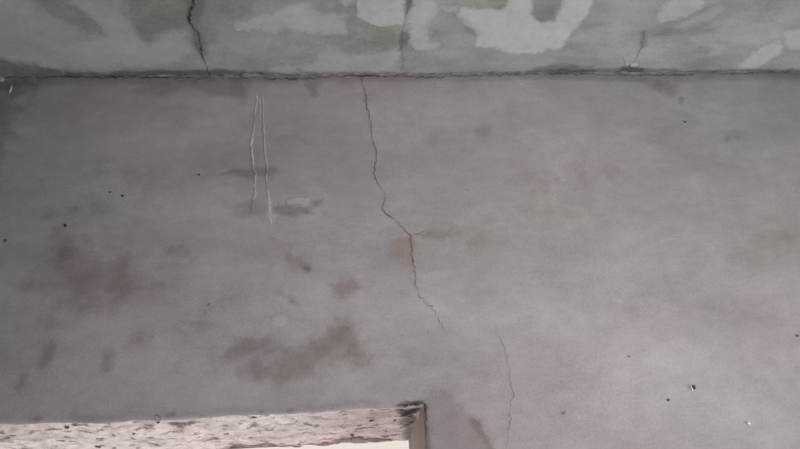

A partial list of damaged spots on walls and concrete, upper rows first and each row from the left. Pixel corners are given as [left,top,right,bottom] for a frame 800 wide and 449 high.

crack [188,0,210,78]
crack [623,53,641,67]